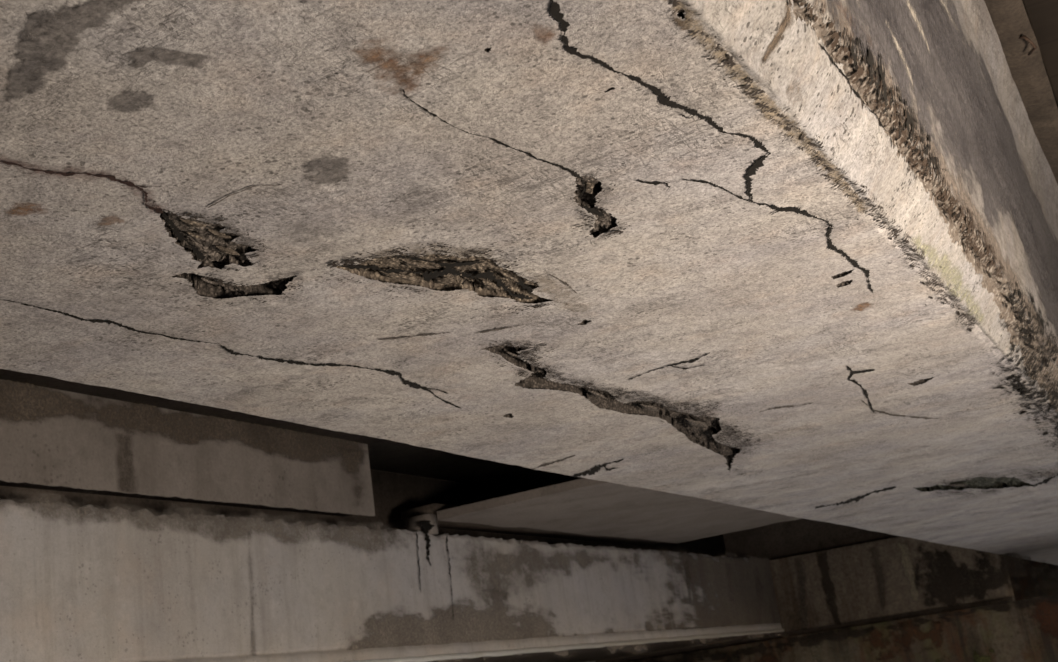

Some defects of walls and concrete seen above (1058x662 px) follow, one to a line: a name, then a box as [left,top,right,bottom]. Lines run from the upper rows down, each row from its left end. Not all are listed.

crack [402,89,583,180]
crack [550,0,873,293]
damp [762,8,790,62]
crack [820,44,886,131]
damp [828,0,1058,336]
spalling [145,200,305,305]
spalling [326,242,572,316]
damp [0,379,365,497]
crack [0,299,460,408]
spalling [476,341,764,477]
crack [847,366,938,419]
damp [349,543,639,657]